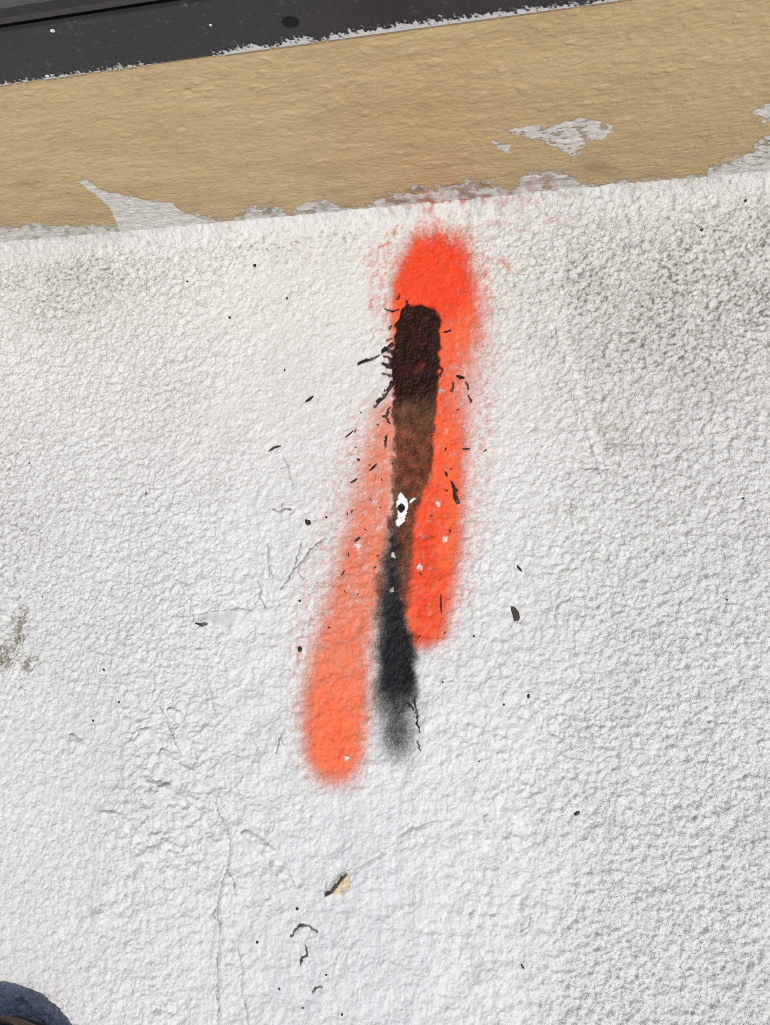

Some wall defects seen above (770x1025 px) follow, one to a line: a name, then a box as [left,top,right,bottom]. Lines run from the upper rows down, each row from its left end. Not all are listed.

peeling [752,104,770,123]
peeling [0,115,770,243]